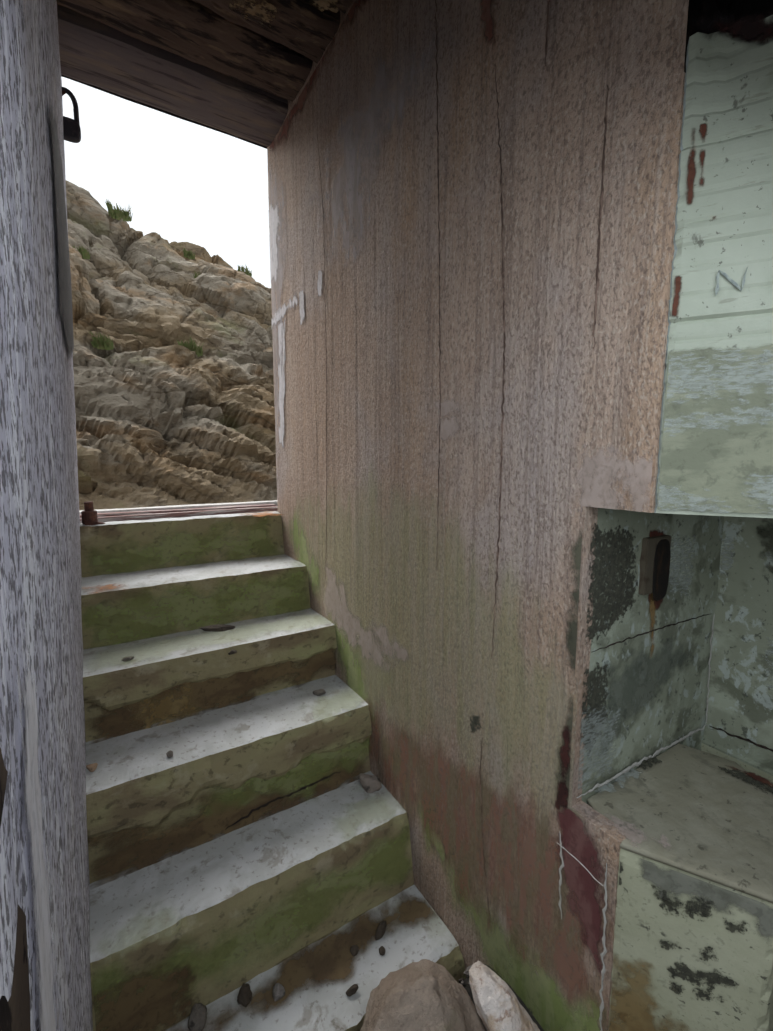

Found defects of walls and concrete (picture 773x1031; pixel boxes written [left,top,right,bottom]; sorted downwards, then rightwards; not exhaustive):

corrosion [687,123,707,204]
corrosion [672,276,682,316]
peeling [579,447,653,512]
corrosion [648,593,663,653]
peeling [555,523,686,1031]
spalling [718,766,773,793]
damp [18,668,58,1031]
spalling [651,885,747,934]
spalling [667,946,739,1003]